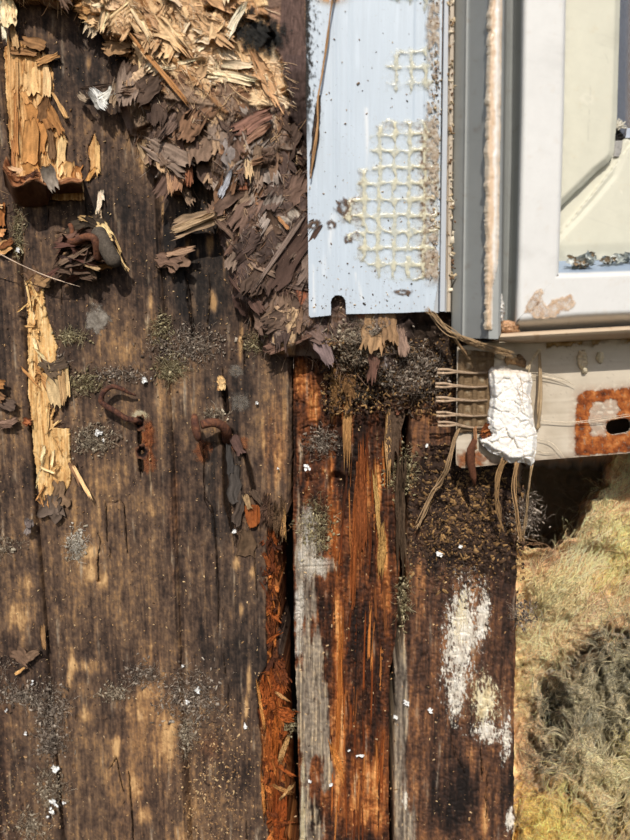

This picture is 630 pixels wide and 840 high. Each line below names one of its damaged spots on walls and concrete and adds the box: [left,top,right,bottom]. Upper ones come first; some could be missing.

spalling [3,0,459,840]
corrosion [575,387,630,456]
leakage [296,580,304,648]
leakage [439,576,512,762]